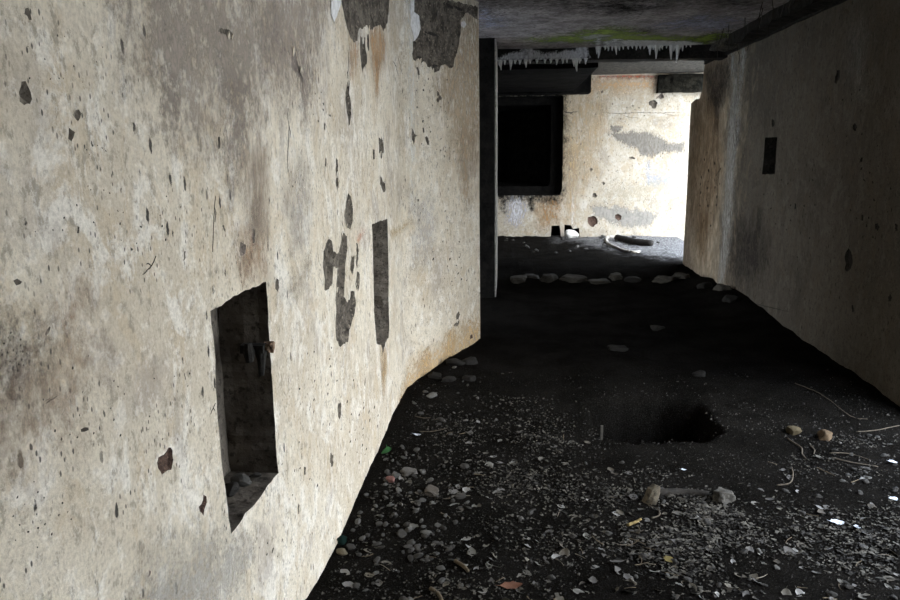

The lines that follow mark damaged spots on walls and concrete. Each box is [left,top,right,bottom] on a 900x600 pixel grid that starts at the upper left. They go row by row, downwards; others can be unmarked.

flaking render [331,0,389,72]
flaking render [410,0,478,91]
water stain [500,15,742,60]
spalling [19,77,32,105]
spalling [345,80,353,125]
peeling [569,162,659,228]
spalling [323,158,360,367]
spalling [157,438,173,474]